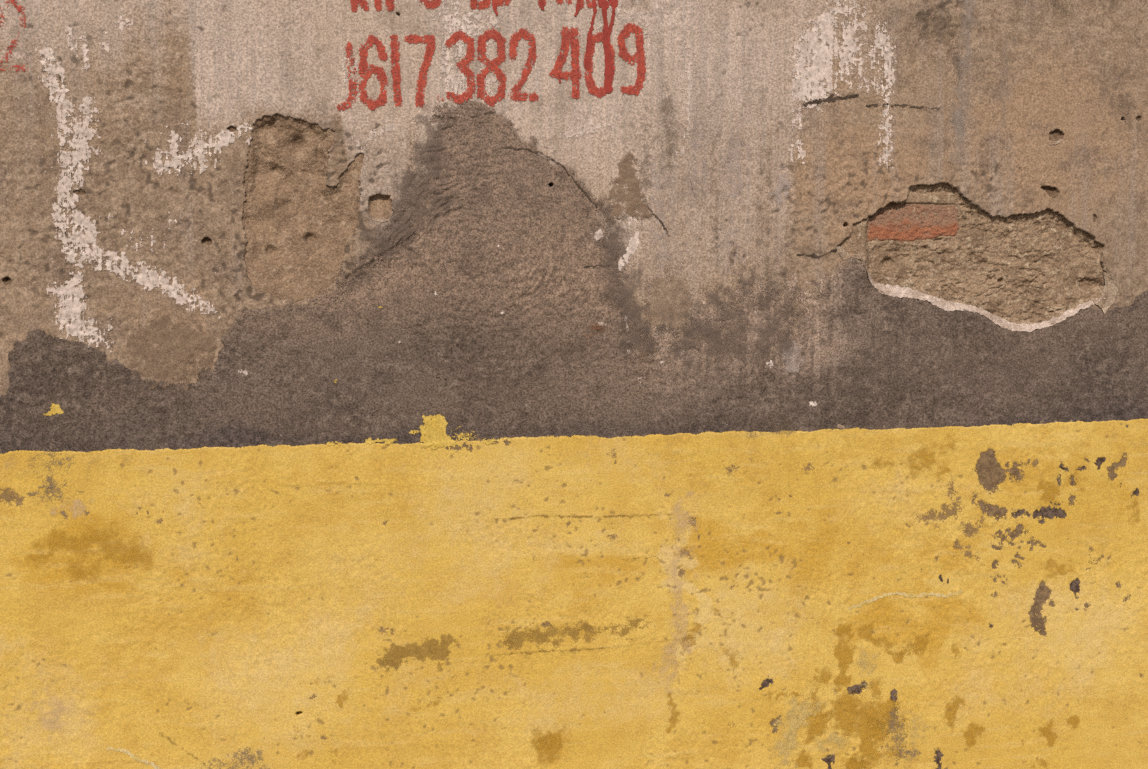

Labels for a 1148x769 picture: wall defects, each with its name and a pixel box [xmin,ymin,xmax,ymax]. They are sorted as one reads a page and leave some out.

damp [61,134,101,187]
spalling [227,114,393,302]
damp [155,268,184,300]
spalling [835,183,1118,332]
peeling [906,449,1140,597]
peeling [1028,581,1055,636]
peeling [1070,547,1111,610]